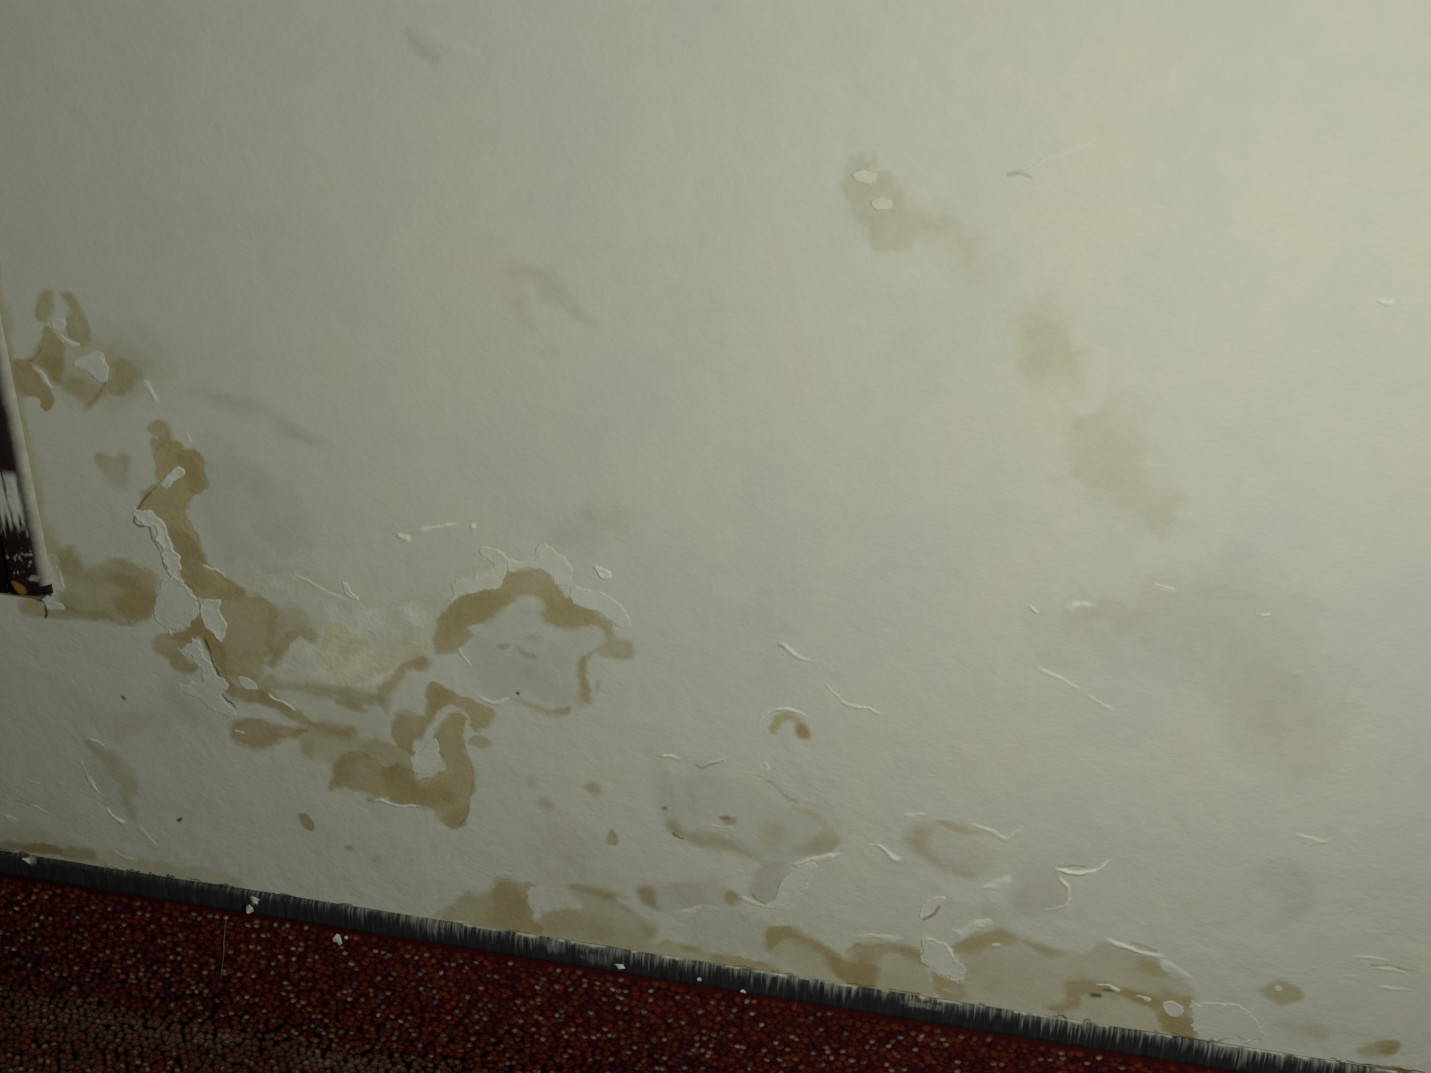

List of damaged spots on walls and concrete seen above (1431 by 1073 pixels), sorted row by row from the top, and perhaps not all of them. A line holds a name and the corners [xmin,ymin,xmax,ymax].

water stain [7,293,318,747]
peeling [449,543,631,629]
peeling [741,852,847,910]
peeling [1039,859,1112,912]
peeling [947,918,995,960]
peeling [1101,936,1197,983]